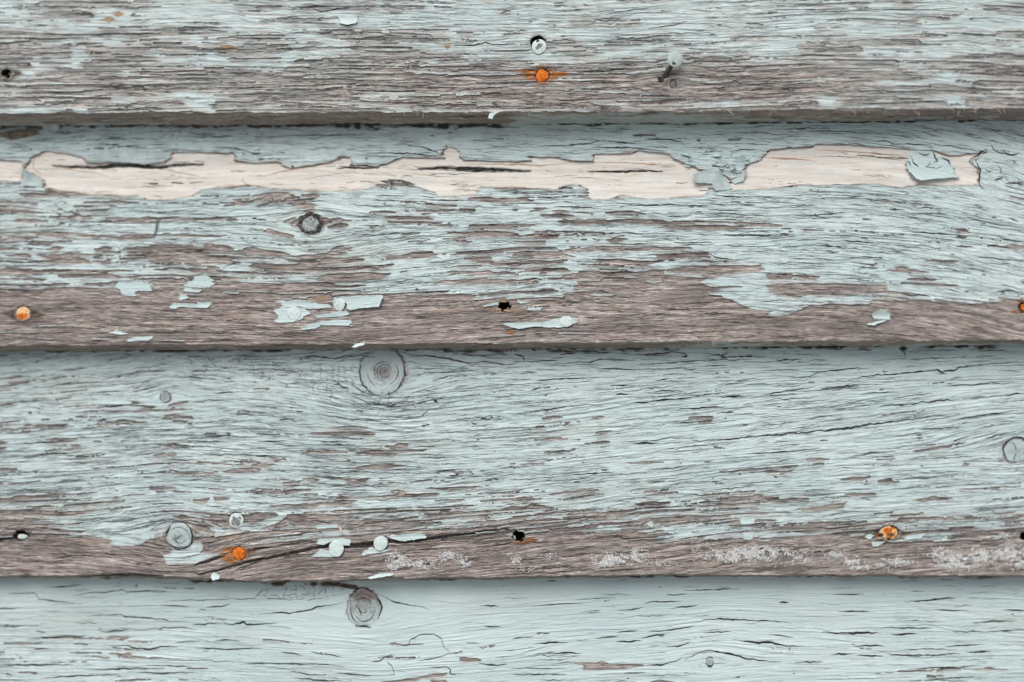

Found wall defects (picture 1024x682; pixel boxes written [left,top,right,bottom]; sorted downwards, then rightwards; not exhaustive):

peeling [338,16,358,25]
peeling [0,32,1024,119]
rust [515,65,570,84]
peeling [0,144,984,200]
peeling [123,237,231,260]
rust [6,308,43,322]
peeling [0,265,1024,348]
crack [0,348,1024,682]
peeling [0,499,1024,581]
rust [867,528,905,543]